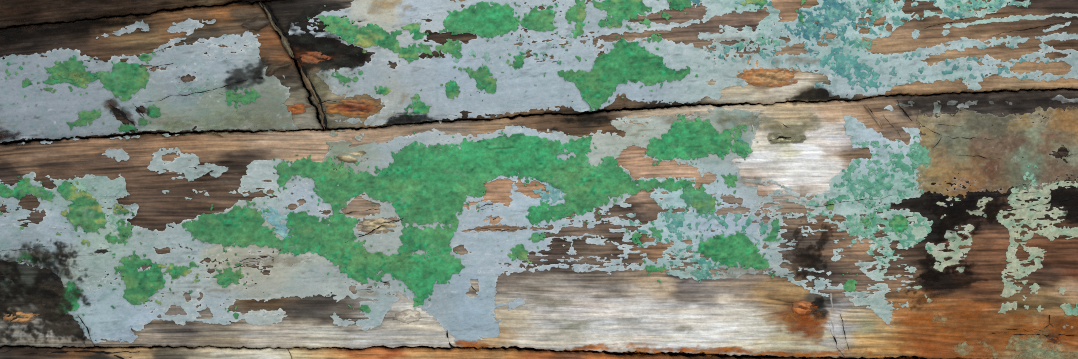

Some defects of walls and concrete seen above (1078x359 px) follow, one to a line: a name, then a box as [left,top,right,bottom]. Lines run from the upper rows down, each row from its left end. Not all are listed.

peeling [0,18,299,162]
crack [238,0,336,130]
peeling [288,0,1078,126]
peeling [0,95,1078,344]
water stain [906,195,1010,301]